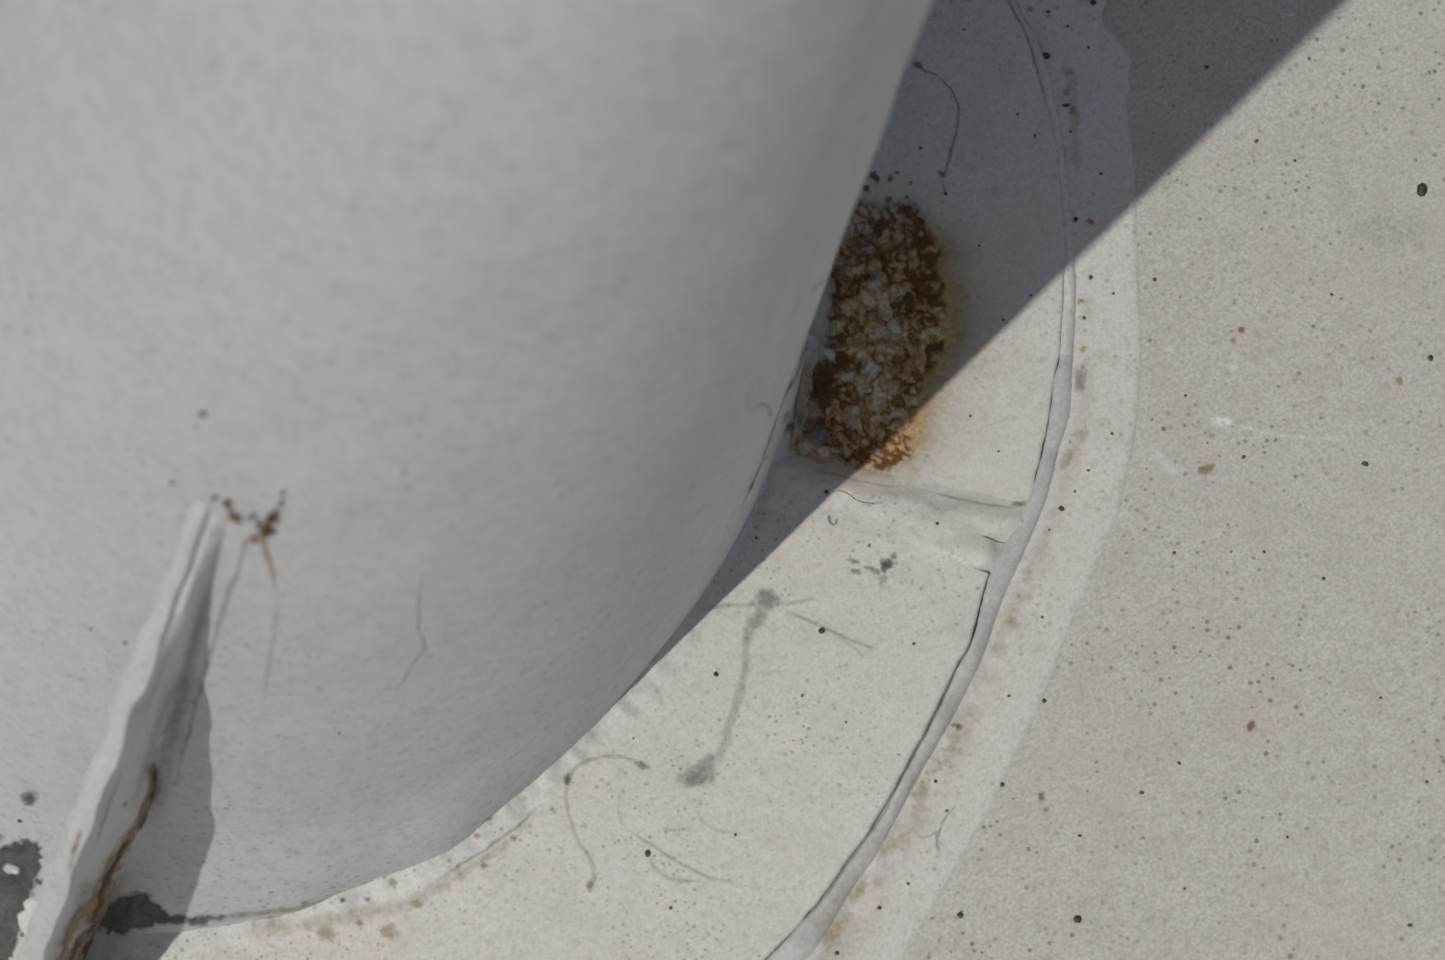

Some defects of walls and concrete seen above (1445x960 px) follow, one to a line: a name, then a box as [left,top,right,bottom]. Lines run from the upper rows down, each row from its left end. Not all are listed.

rust [751,171,965,489]
rust [211,490,285,559]
rust [59,764,159,960]